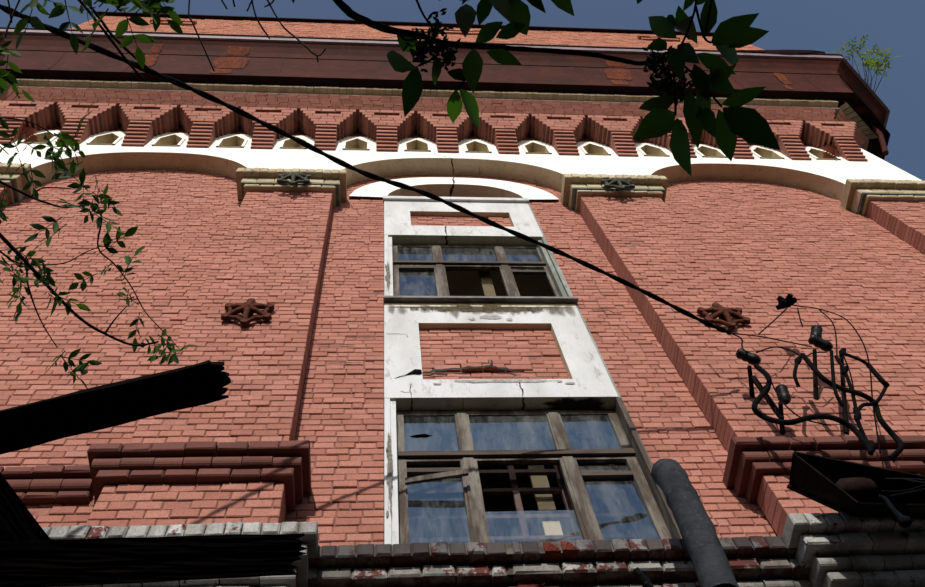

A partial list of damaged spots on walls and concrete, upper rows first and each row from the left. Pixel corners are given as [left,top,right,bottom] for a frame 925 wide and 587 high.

crack [434,153,455,197]
crack [401,360,525,410]
spalling [542,541,580,564]